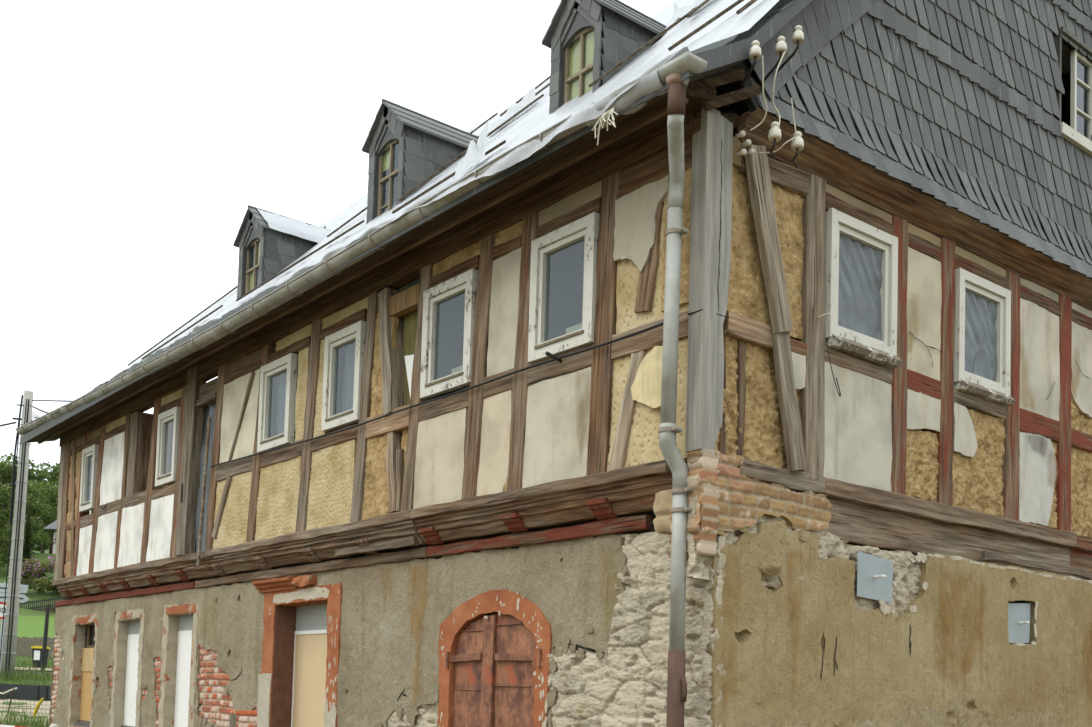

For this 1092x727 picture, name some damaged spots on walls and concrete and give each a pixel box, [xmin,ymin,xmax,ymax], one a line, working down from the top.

flaking render [653,489,673,559]
flaking render [686,448,1092,620]
flaking render [1015,601,1039,646]
flaking render [50,631,74,725]
flaking render [137,633,166,727]
flaking render [189,627,272,727]